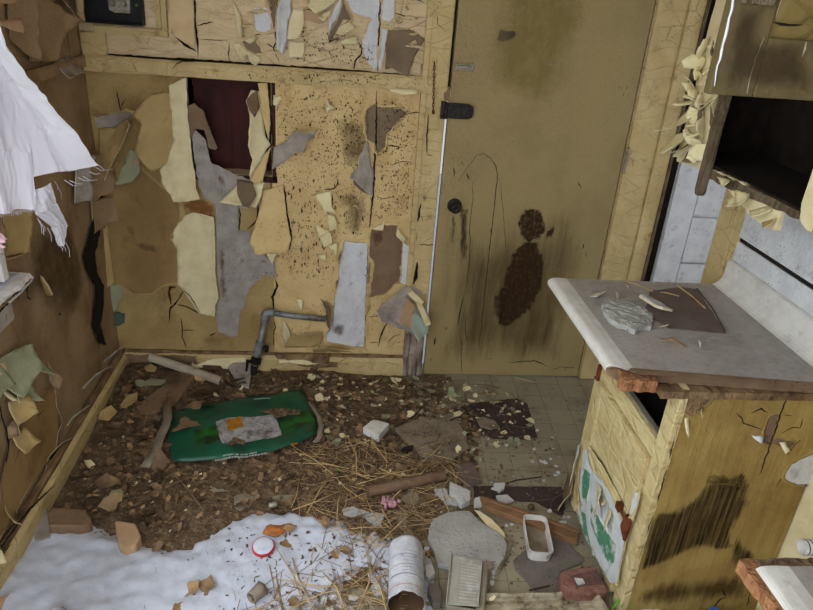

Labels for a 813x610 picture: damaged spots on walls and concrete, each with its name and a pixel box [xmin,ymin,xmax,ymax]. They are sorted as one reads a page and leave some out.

crack [173,0,230,75]
peeling [232,0,424,77]
crack [773,20,801,28]
peeling [653,37,718,164]
spalling [74,77,317,345]
crack [169,290,215,346]
peeling [274,191,431,365]
water stain [470,209,554,349]
peeling [0,344,89,540]
crack [737,408,803,455]
water stain [643,474,753,569]
water stain [647,579,741,599]